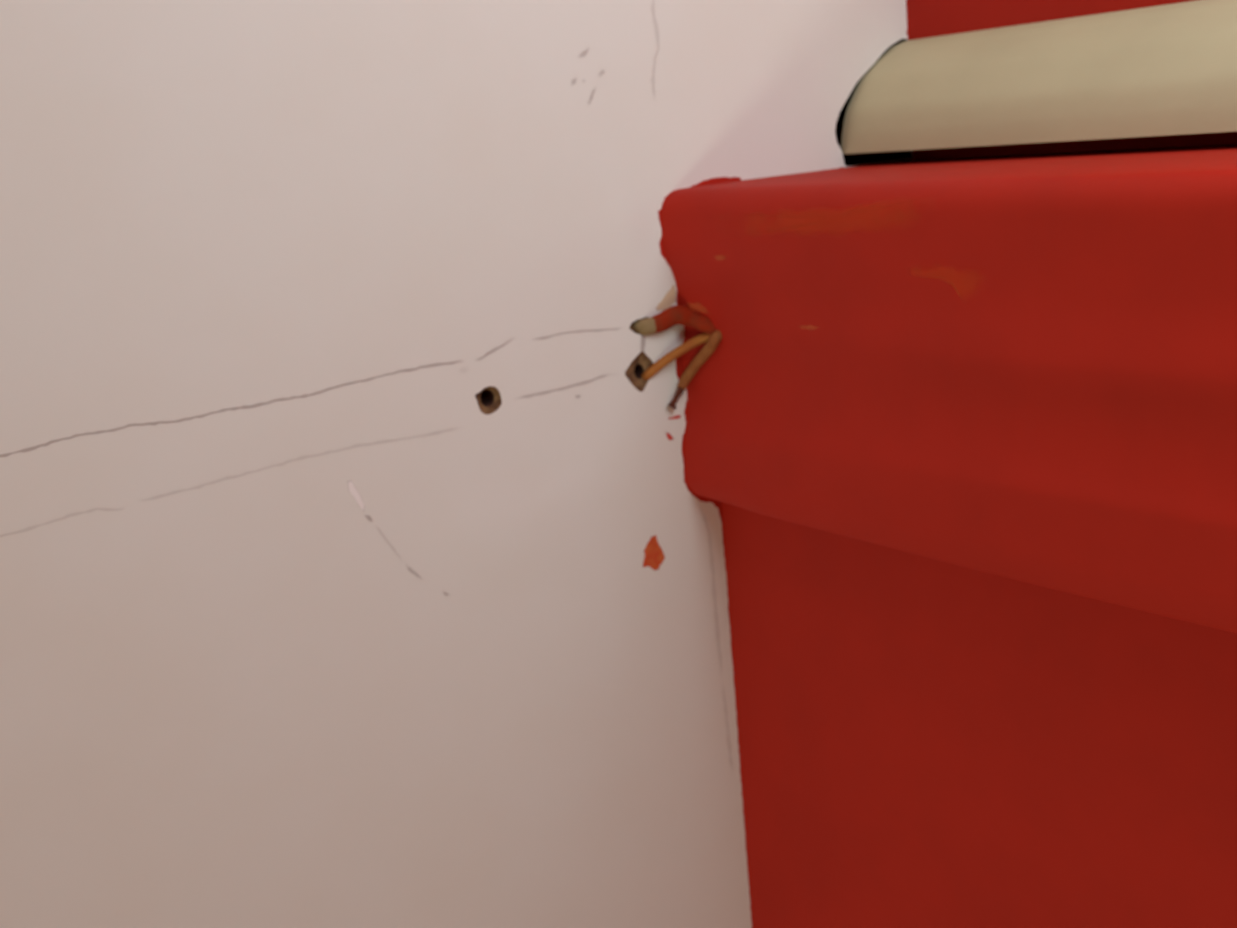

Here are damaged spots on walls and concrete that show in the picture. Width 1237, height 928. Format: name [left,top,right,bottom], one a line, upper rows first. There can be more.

spalling [629,285,676,335]
spalling [625,351,653,392]